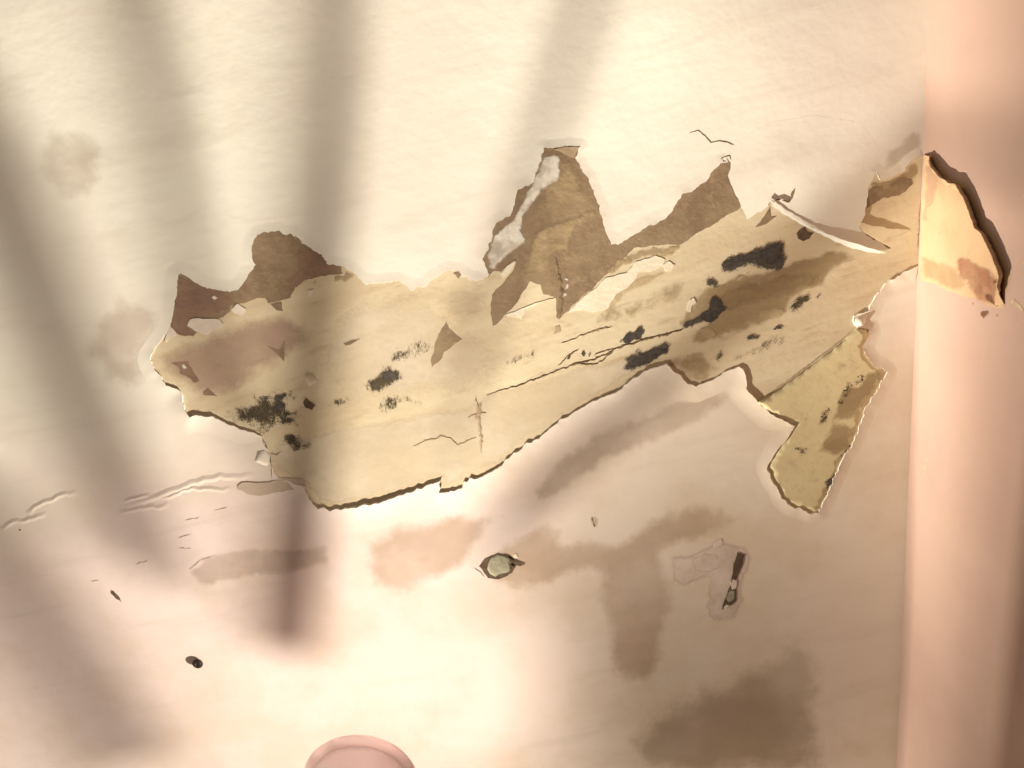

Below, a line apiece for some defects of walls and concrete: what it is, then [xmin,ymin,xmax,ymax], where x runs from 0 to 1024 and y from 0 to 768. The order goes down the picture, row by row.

peeling [136,115,1010,536]
water stain [682,241,787,328]
water stain [789,294,819,312]
crack [415,326,687,451]
water stain [227,391,315,452]
spalling [475,553,525,579]
spalling [722,552,744,610]